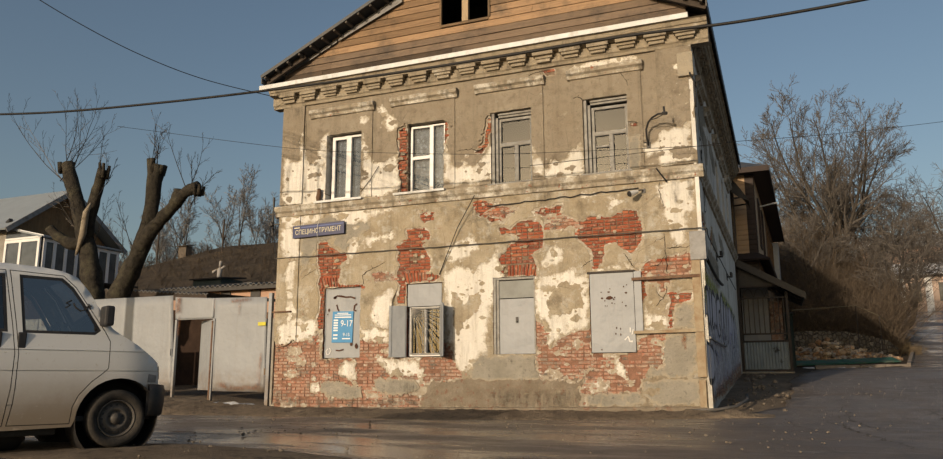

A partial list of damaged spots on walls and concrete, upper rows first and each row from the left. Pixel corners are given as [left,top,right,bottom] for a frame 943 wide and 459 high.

spalling [272,101,712,408]